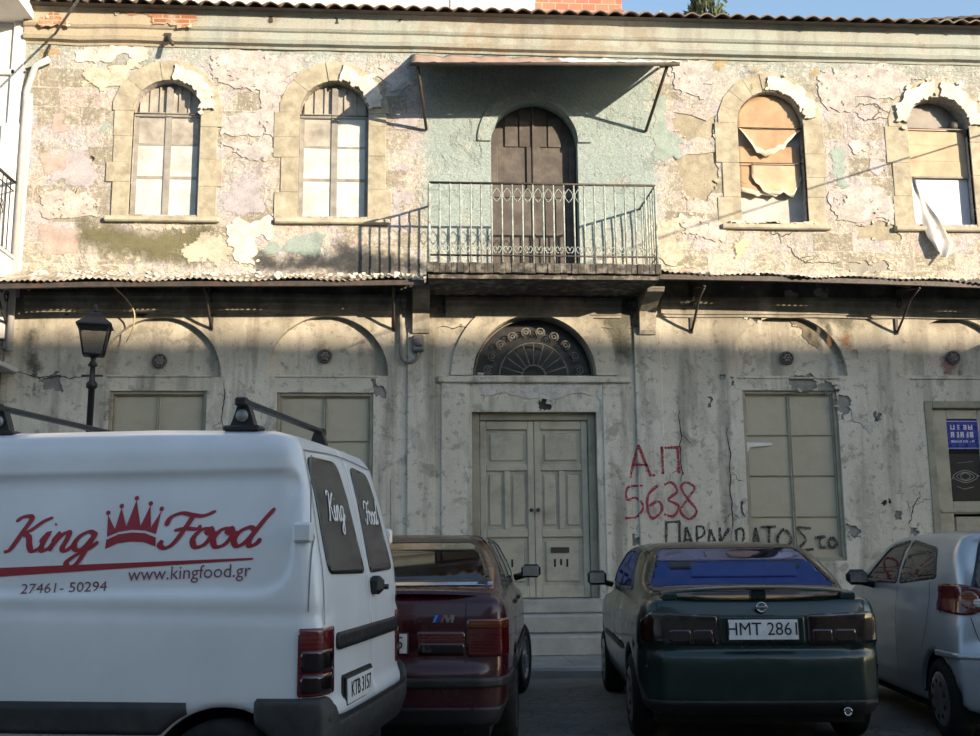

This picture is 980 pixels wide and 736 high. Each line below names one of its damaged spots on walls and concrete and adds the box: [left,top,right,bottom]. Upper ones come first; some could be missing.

flaking render [104,3,198,28]
peeling [63,45,148,92]
peeling [765,63,980,130]
crack [856,103,889,121]
flaking render [644,59,726,267]
peeling [34,143,100,256]
damp [254,245,427,281]
crack [724,428,744,534]